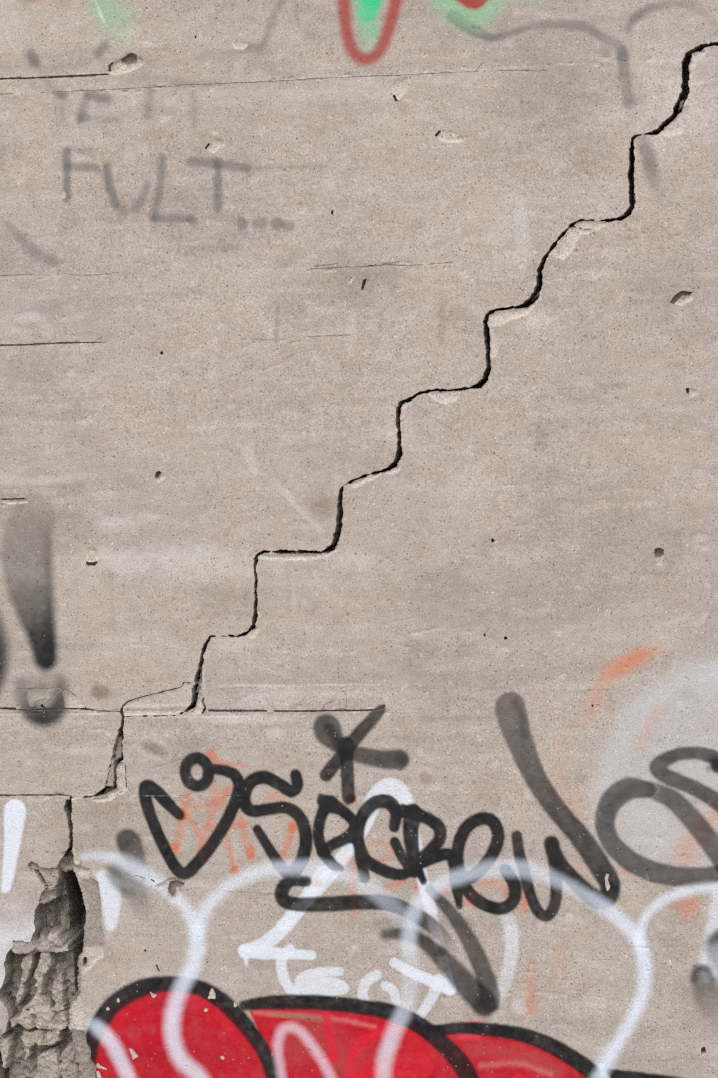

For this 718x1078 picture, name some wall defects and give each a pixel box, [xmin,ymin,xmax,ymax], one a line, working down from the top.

crack [0,42,718,865]
spalling [0,851,107,1078]